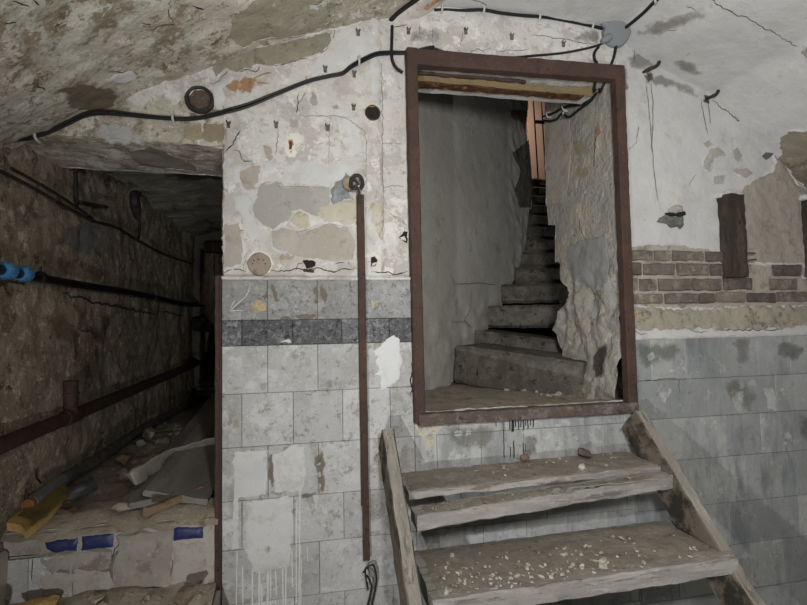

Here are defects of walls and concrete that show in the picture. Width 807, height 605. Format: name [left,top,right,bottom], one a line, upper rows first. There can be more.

crack [713,0,795,46]
peeling [212,0,381,101]
rust [227,72,270,92]
peeling [222,102,362,270]
flaking render [632,126,807,310]
crack [0,281,25,297]
crack [62,292,181,316]
spalling [558,288,569,304]
peeling [40,529,207,588]